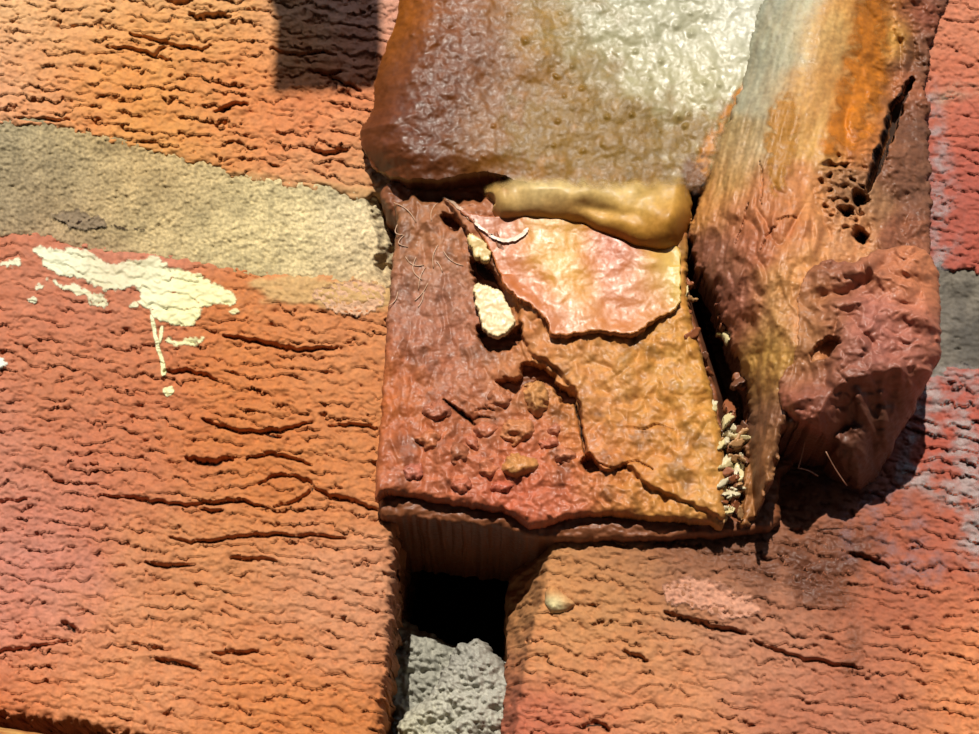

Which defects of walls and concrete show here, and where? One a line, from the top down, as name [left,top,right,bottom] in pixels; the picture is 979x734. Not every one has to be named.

corrosion [360,0,743,189]
corrosion [764,93,800,189]
corrosion [822,0,887,154]
crack [866,80,914,191]
peeling [442,197,704,340]
peeling [716,314,730,346]
peeling [712,372,751,525]